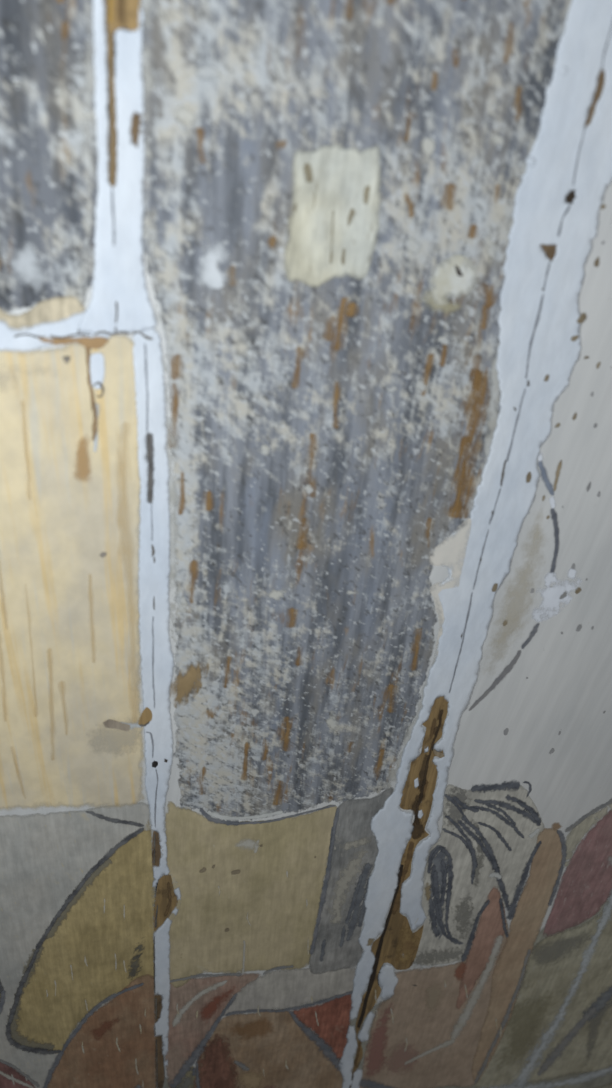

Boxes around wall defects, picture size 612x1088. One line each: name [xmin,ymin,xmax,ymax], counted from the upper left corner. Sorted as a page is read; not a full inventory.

leakage [304,163,315,209]
leakage [348,186,370,226]
peeling [131,0,572,820]
peeling [531,563,587,622]
spalling [103,707,152,731]